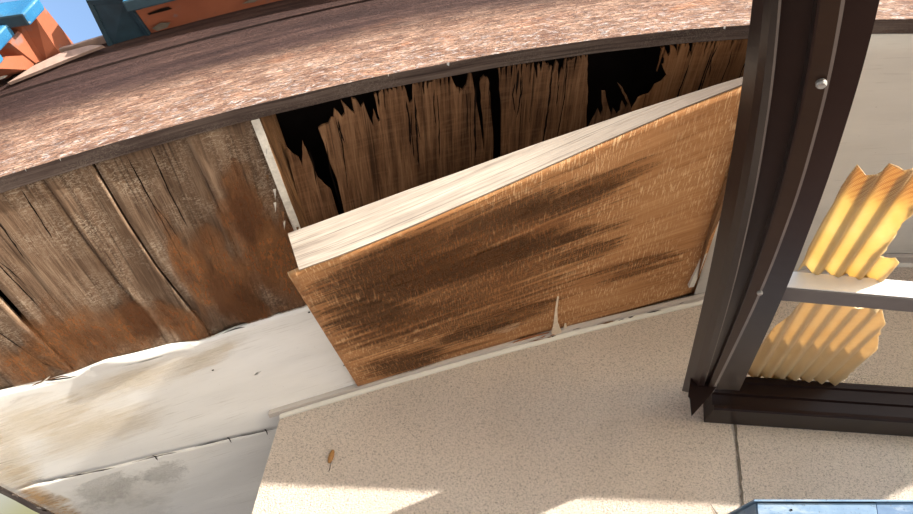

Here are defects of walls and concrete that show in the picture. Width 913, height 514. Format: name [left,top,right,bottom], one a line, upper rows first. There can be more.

crack [22,191,52,237]
crack [127,149,192,277]
crack [0,224,41,309]
damp [167,157,679,378]
crack [0,333,75,388]
damp [0,298,211,385]
crack [0,461,112,483]
crack [136,428,277,462]
crack [734,424,744,506]